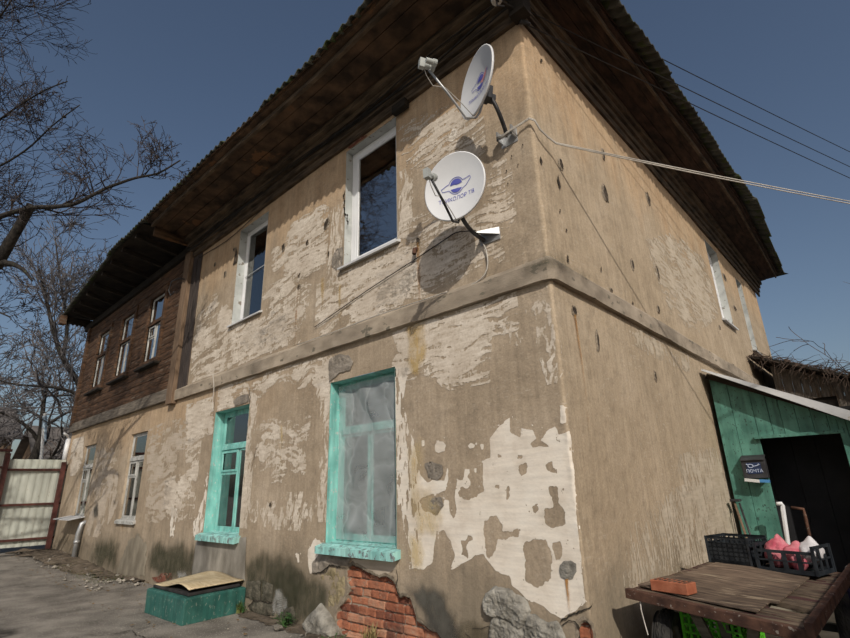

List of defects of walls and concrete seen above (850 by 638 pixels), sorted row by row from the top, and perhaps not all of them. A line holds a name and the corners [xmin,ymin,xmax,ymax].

flaking render [191,105,519,383]
flaking render [70,436,84,476]
flaking render [86,448,119,538]
flaking render [145,354,353,537]
flaking render [392,286,596,638]
flaking render [295,538,440,638]